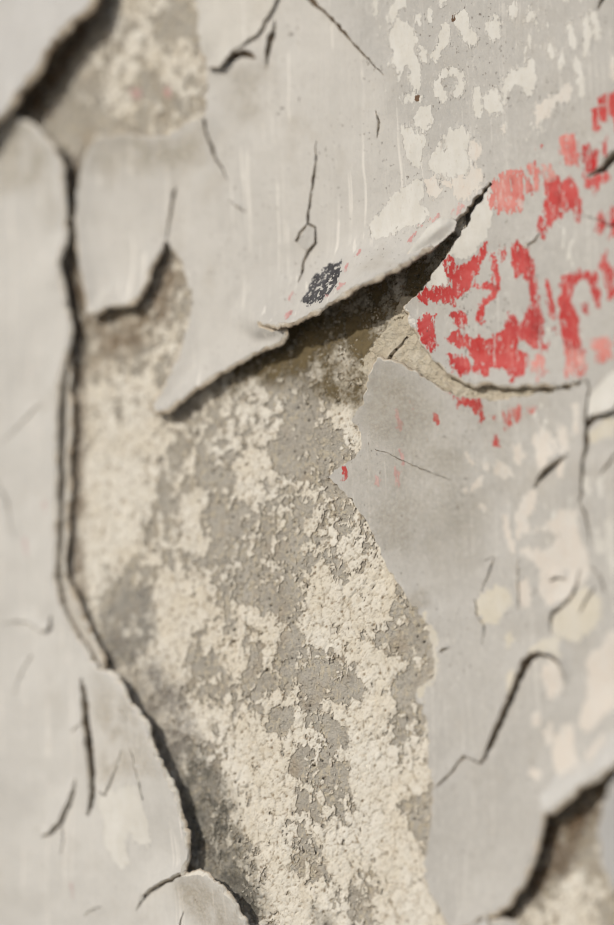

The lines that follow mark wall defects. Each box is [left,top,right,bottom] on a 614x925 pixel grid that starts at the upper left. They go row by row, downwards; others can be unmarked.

crack [213,2,276,69]
crack [309,0,382,73]
peeling [442,76,457,93]
crack [534,380,614,535]
crack [550,567,605,626]
crack [438,651,565,786]
crack [42,679,106,841]